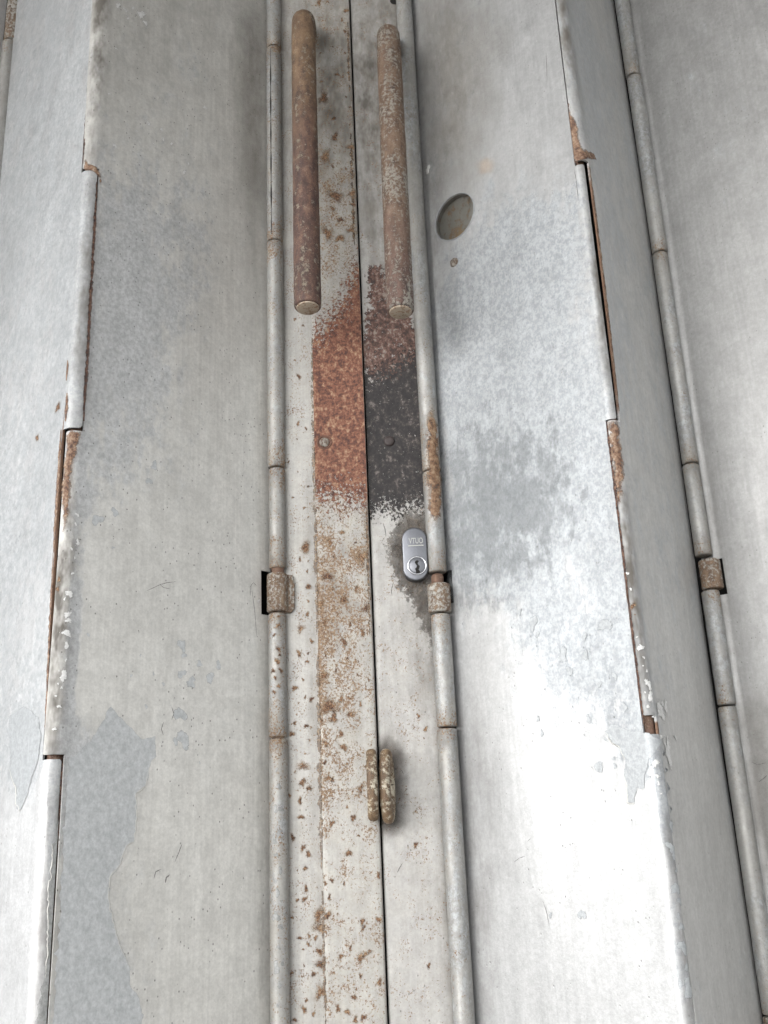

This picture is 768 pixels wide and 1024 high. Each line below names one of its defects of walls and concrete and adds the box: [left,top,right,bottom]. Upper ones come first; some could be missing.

corrosion [44,123,102,727]
corrosion [269,124,416,1024]
water stain [365,345,425,525]
corrosion [426,412,442,520]
corrosion [568,104,644,725]
peeling [594,636,677,804]